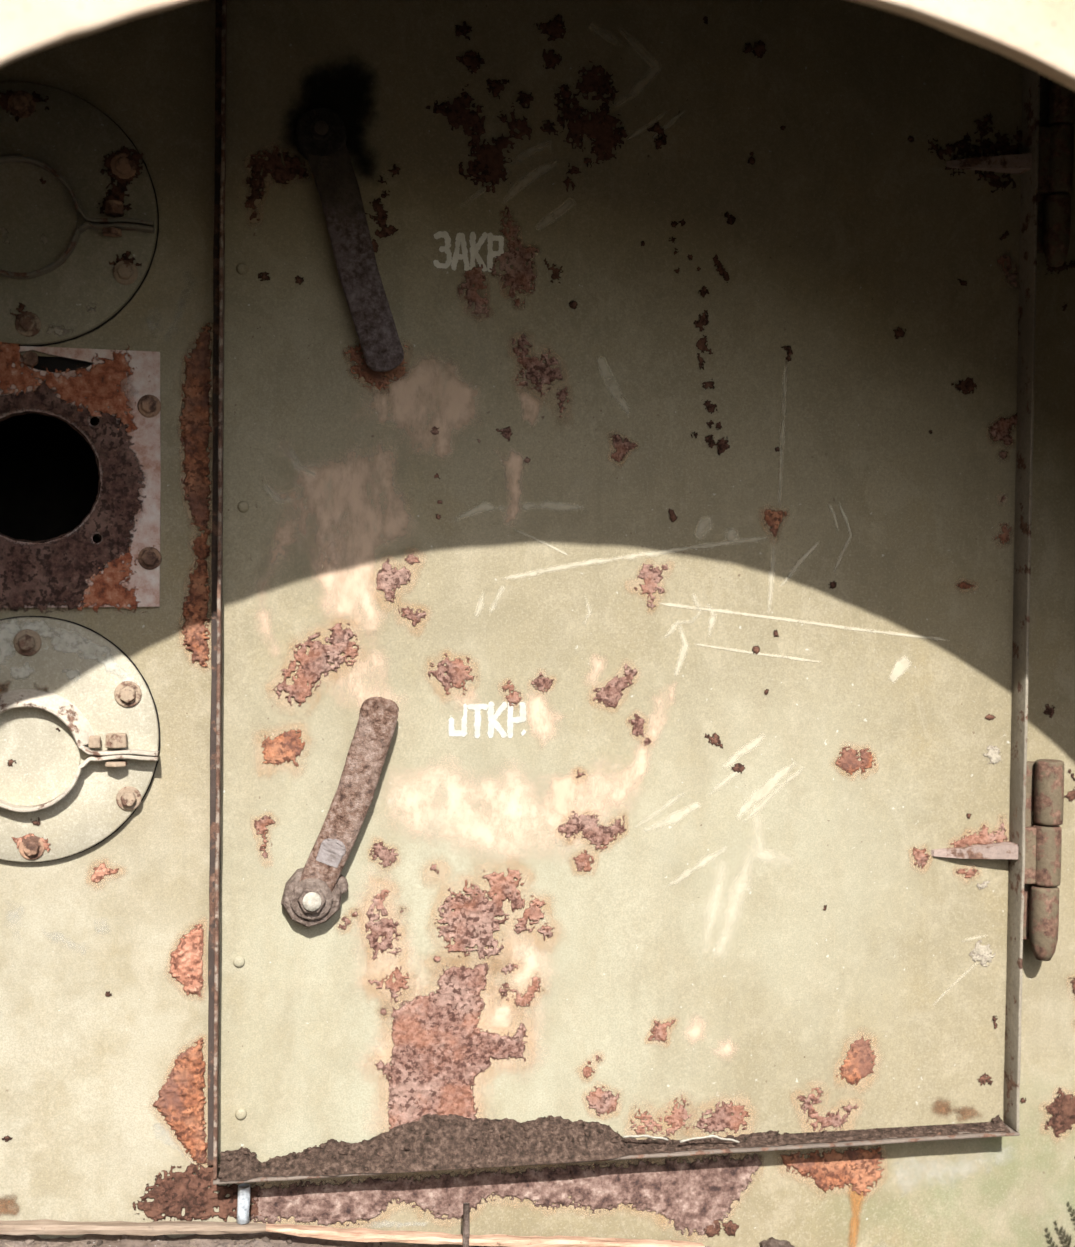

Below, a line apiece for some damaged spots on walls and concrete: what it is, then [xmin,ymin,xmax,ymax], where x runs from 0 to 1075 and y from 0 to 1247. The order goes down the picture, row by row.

rust [426,14,628,193]
rust [691,286,730,455]
rust [0,342,146,613]
rust [179,323,213,667]
rust [269,623,361,706]
rust [558,811,626,872]
rust [168,924,204,997]
rust [339,868,555,1129]
rust [133,1037,762,1238]
rust [780,1147,884,1247]
rust [836,1037,876,1085]
rust [1044,1087,1075,1137]